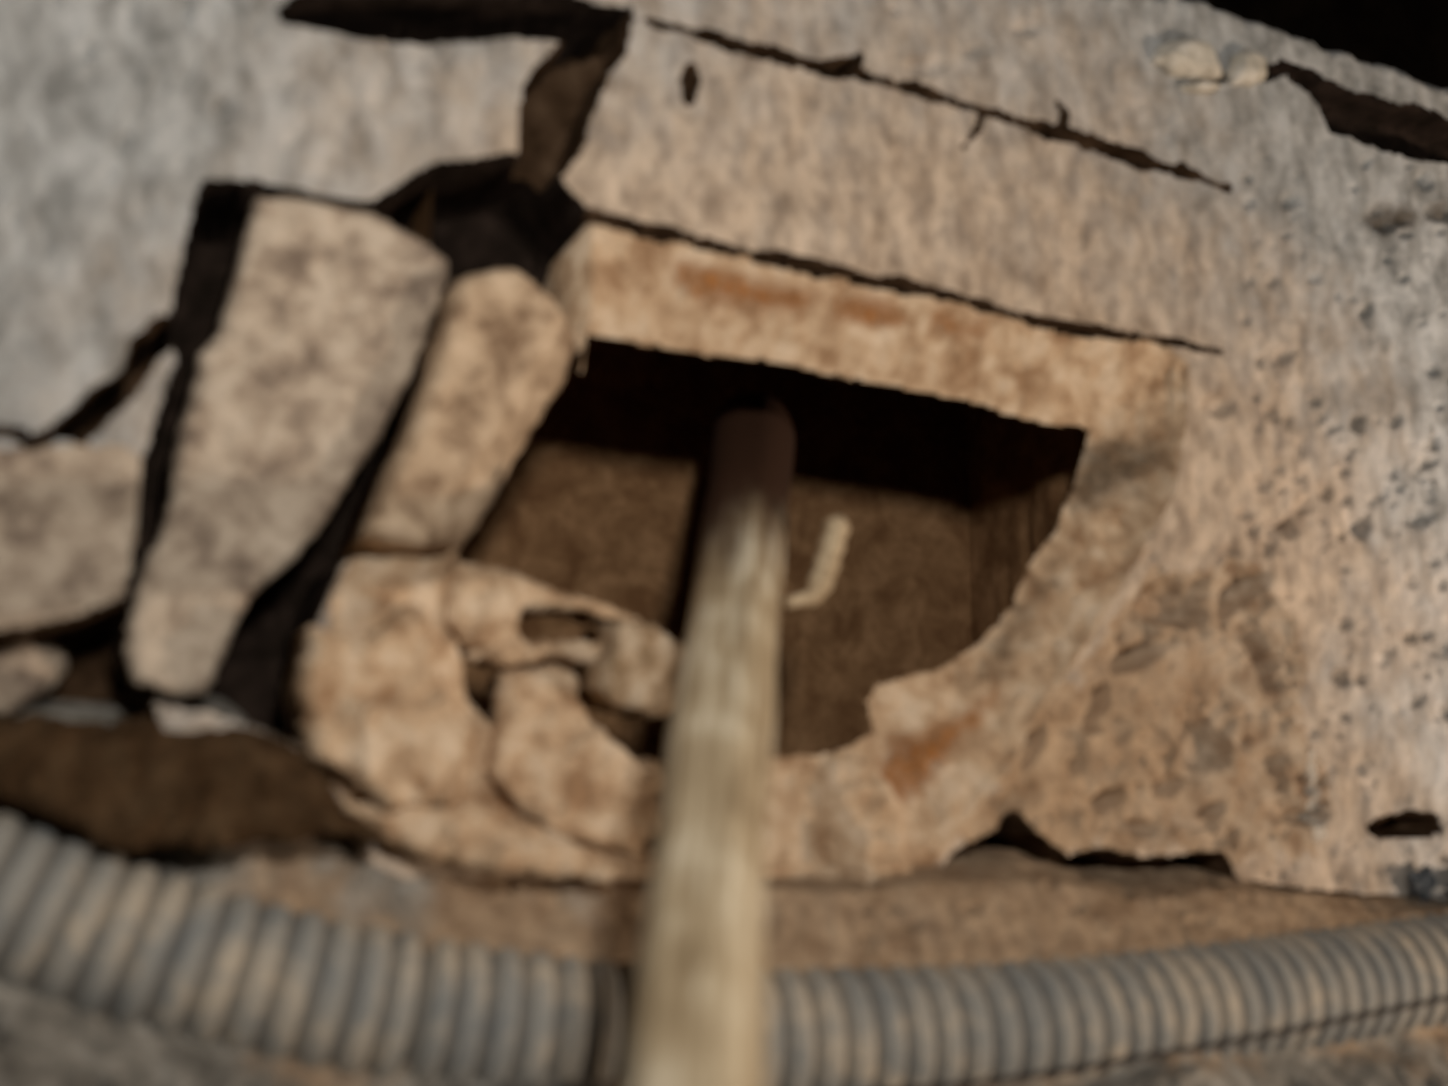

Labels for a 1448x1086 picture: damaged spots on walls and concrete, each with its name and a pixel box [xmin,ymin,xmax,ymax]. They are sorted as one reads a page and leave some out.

crack [632,16,1232,194]
crack [1264,57,1448,164]
spalling [113,151,1332,880]